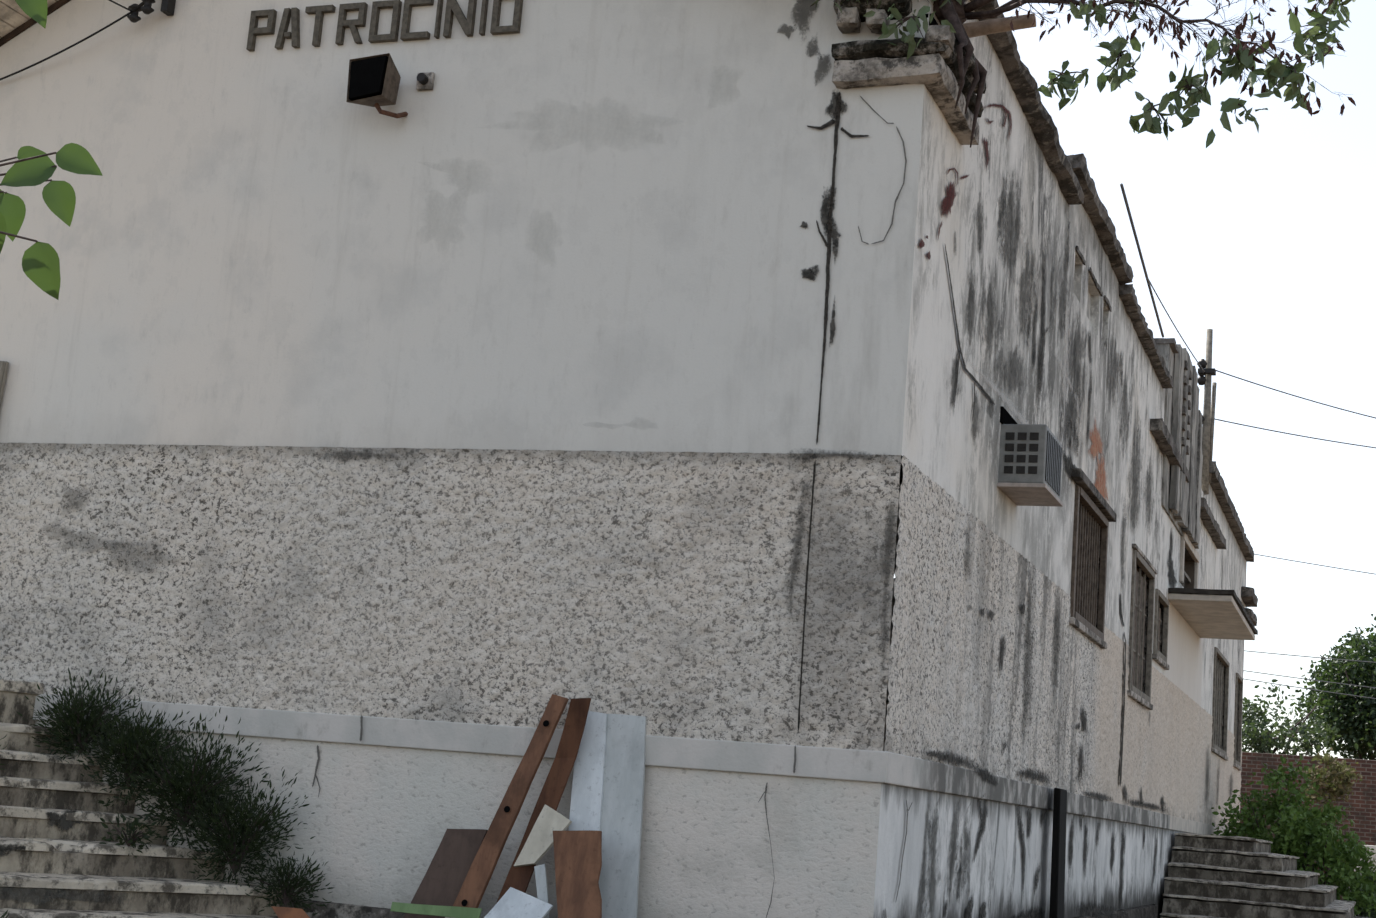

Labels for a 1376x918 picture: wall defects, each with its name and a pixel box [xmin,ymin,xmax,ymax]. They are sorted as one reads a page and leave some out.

leakage [950,174,1154,586]
leakage [787,484,808,604]
leakage [790,450,872,461]
crack [759,92,907,918]
flaking render [1090,417,1108,499]
leakage [1168,528,1178,588]
leakage [1021,572,1035,735]
leakage [0,887,124,905]
leakage [917,750,998,918]
leakage [1011,804,1048,918]
leakage [1018,768,1049,783]
leakage [1069,707,1166,918]